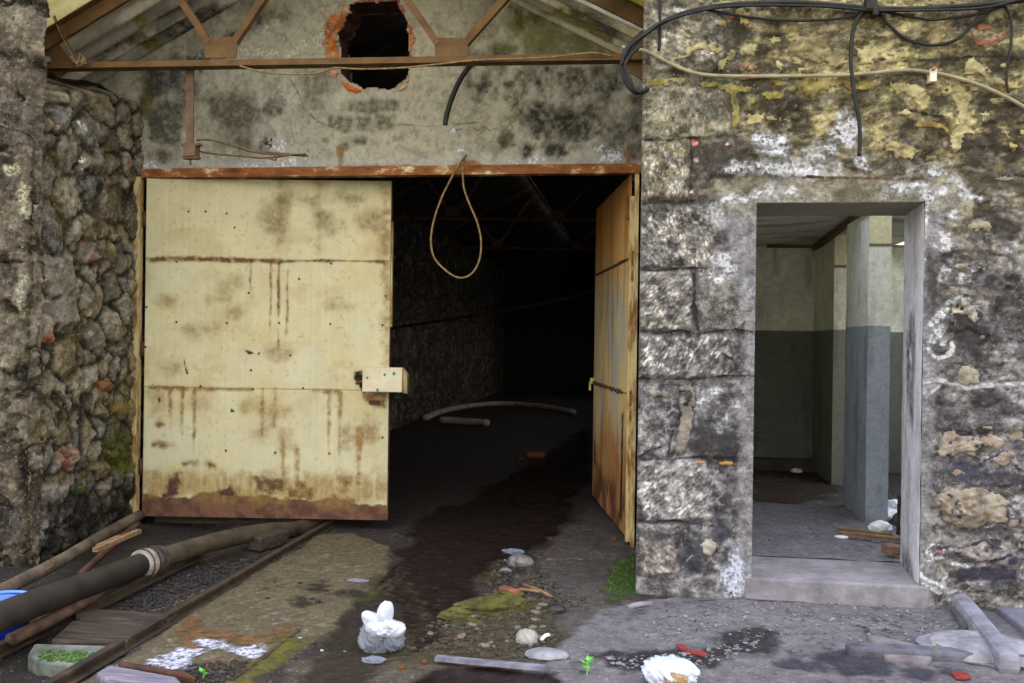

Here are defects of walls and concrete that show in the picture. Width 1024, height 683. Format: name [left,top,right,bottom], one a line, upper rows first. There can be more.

damp [143,50,213,169]
damp [210,94,307,168]
damp [225,15,324,59]
damp [329,100,396,146]
spalling [322,0,416,94]
damp [500,67,642,164]
damp [652,56,868,228]
flaking render [646,34,919,128]
flaking render [865,127,937,161]
flaking render [890,24,1024,153]
damp [890,92,1024,424]
spalling [937,426,1024,531]